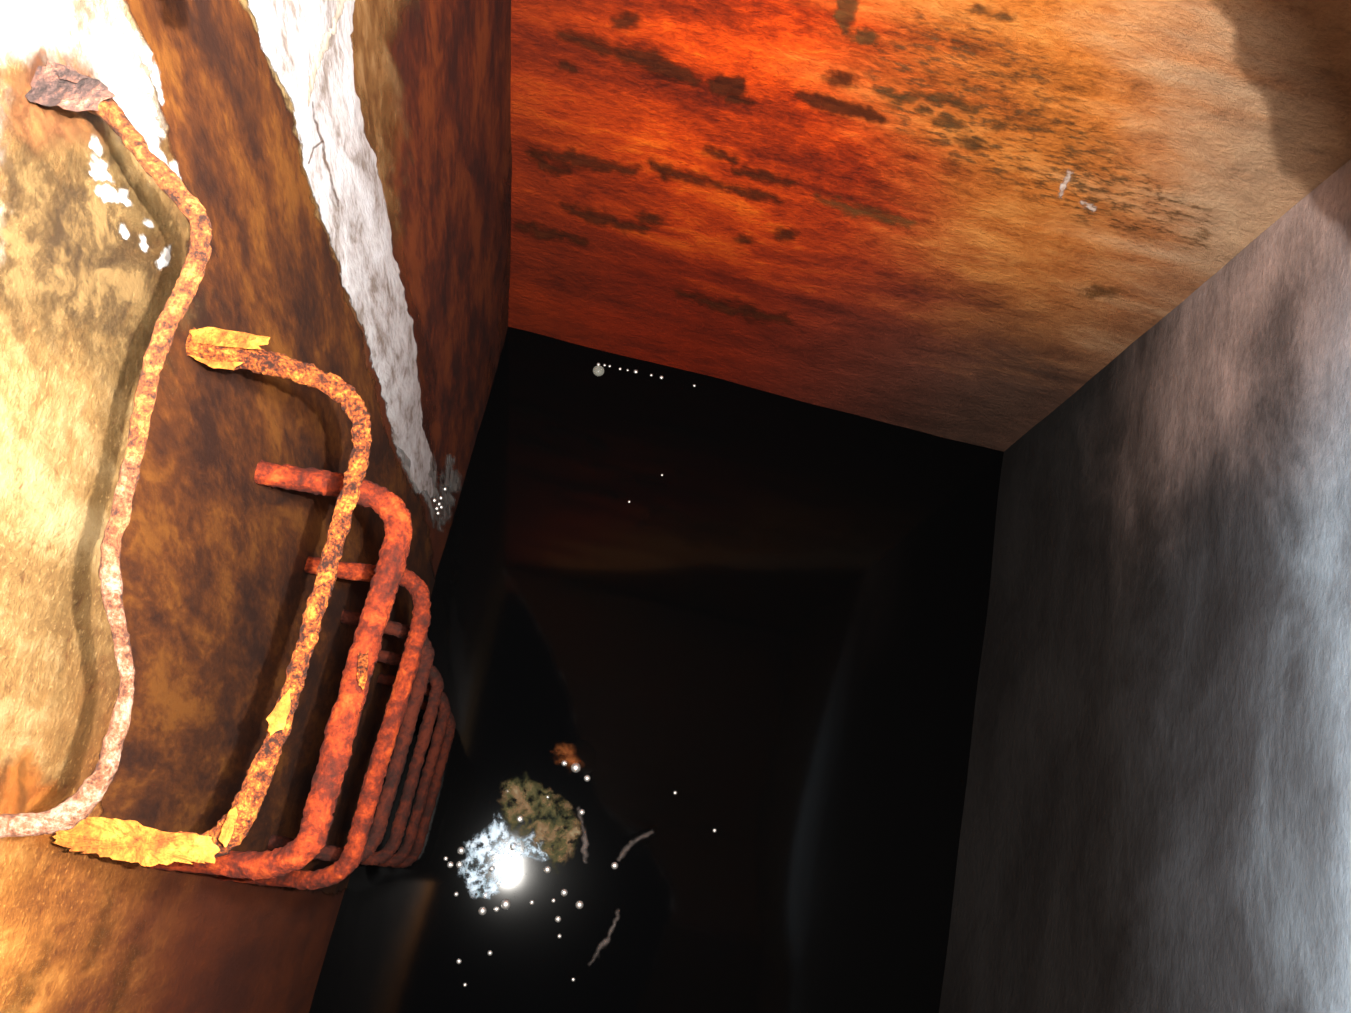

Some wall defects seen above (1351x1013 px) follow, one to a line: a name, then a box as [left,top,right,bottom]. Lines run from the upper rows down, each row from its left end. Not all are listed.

damp [827,70,853,86]
rust [0,45,180,381]
damp [815,194,914,225]
damp [0,0,795,871]
rust [0,762,55,815]
damp [279,874,350,896]